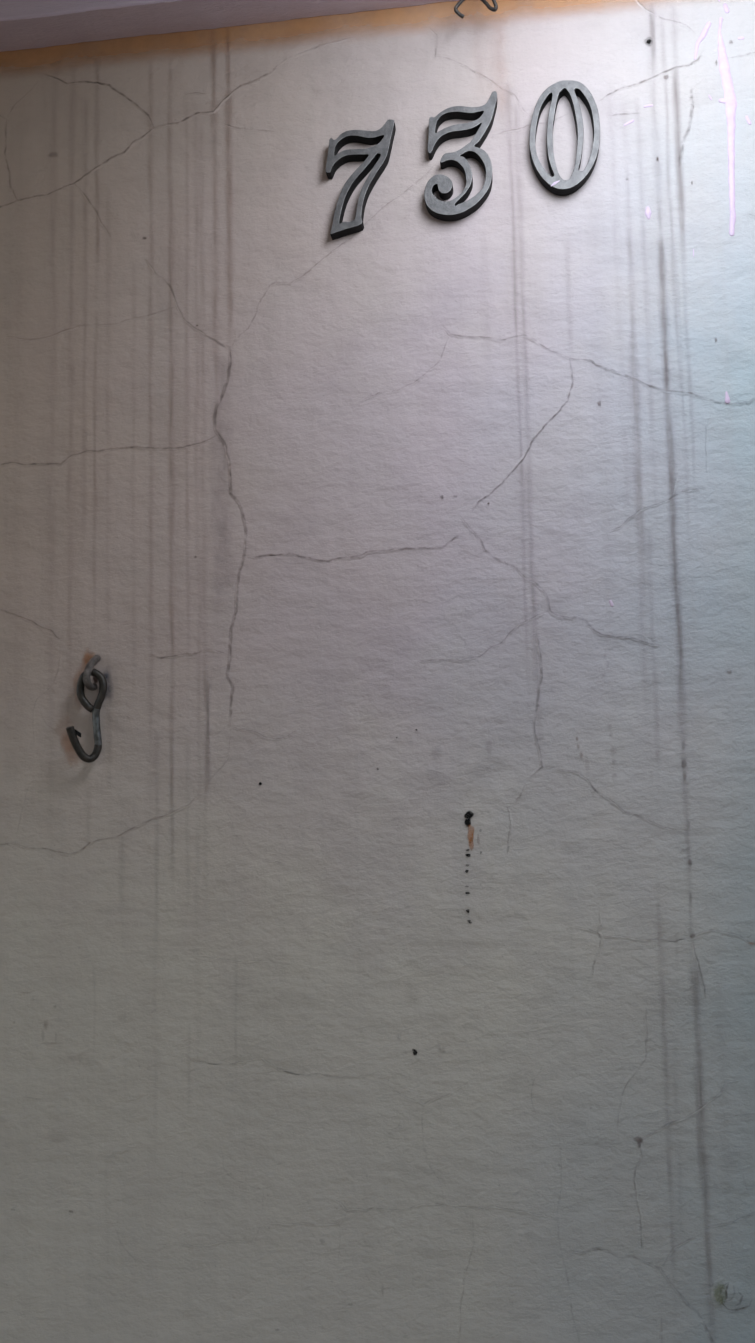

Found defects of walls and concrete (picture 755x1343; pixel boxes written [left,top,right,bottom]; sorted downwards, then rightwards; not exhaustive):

crack [0,325,755,849]
crack [573,912,755,998]